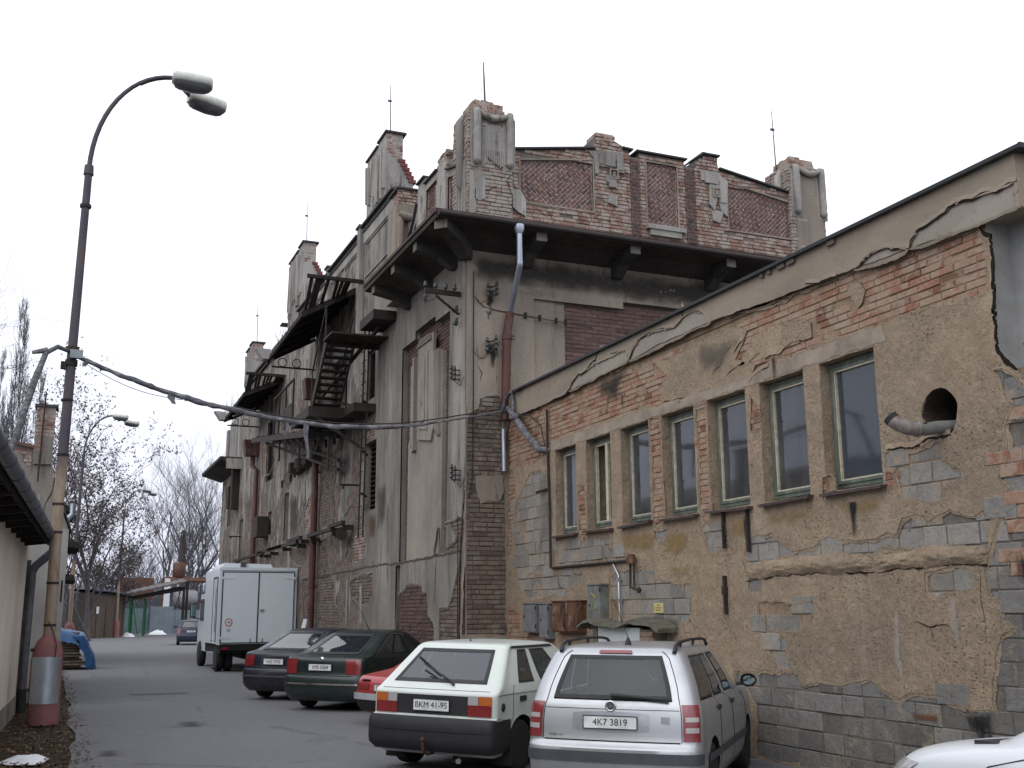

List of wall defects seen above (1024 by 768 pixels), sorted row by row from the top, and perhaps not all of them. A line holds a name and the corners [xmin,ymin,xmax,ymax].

crack [526,303,768,419]
flaking render [395,181,1020,643]
crack [805,176,1016,284]
crack [979,226,1024,370]
flaking render [733,366,1024,768]